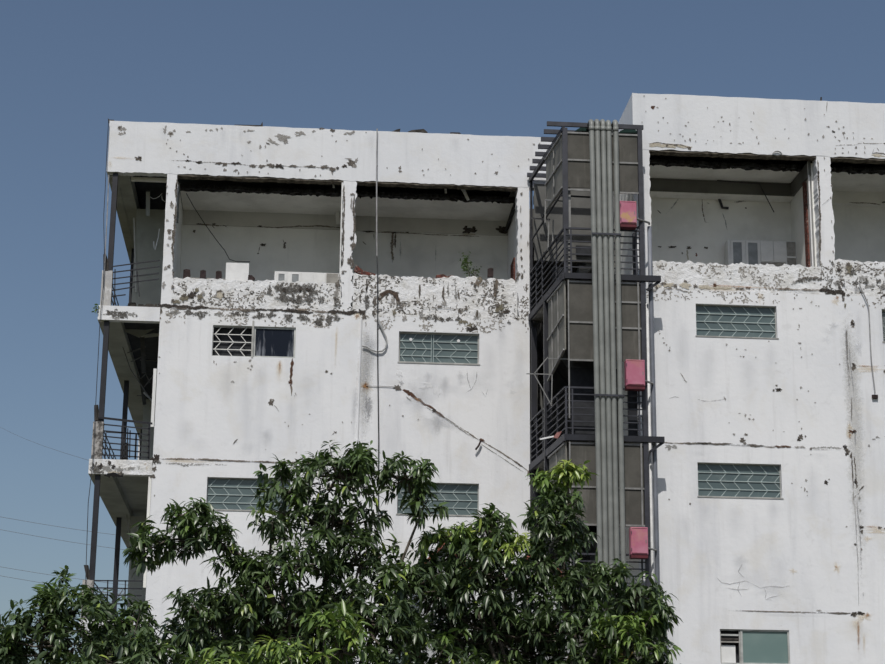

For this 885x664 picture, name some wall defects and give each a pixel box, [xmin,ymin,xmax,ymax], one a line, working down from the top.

peeling [242,128,367,156]
spalling [649,117,721,150]
peeling [808,120,885,157]
spalling [162,180,529,333]
flaking render [647,157,885,310]
crack [393,385,530,474]
crack [665,330,865,617]